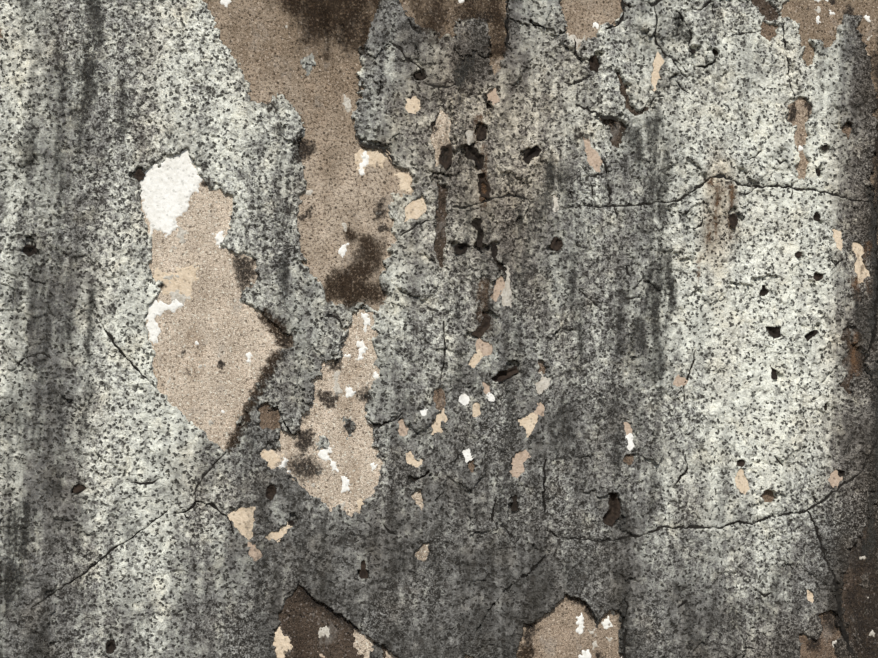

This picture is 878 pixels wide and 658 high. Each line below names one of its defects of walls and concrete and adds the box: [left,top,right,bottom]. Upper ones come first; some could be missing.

damp [282,0,380,52]
damp [411,0,507,58]
peeling [751,0,878,220]
damp [324,227,385,309]
peeling [137,0,626,517]
crack [571,160,878,388]
crack [94,304,156,388]
crack [34,457,234,606]
peeling [273,521,634,658]
crack [491,499,519,542]
crack [521,438,878,658]